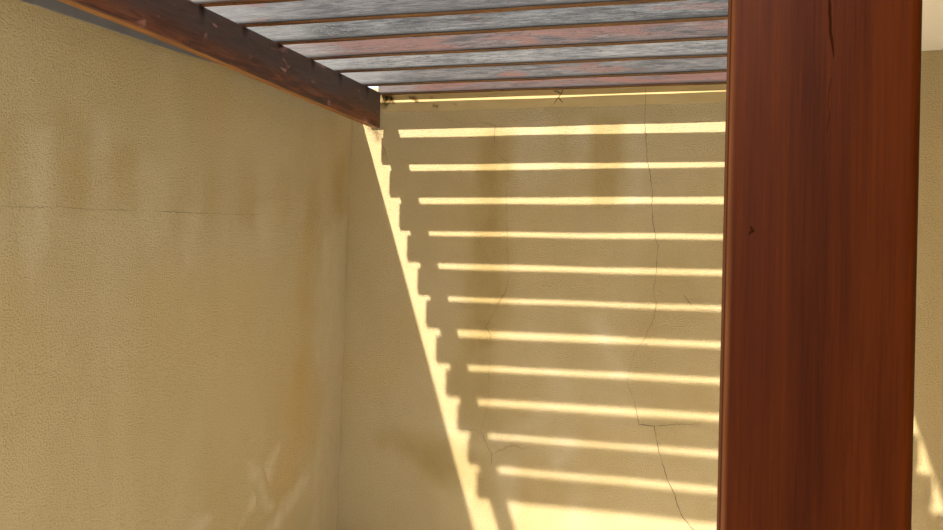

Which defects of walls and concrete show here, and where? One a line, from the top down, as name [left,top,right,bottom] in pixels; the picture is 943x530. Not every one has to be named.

damp [573,305,638,393]
crack [627,91,694,530]
damp [397,360,595,529]